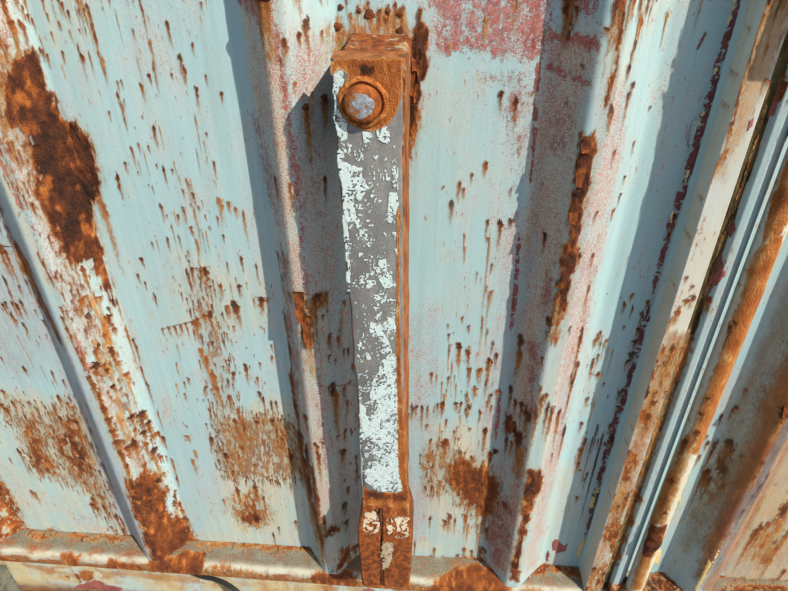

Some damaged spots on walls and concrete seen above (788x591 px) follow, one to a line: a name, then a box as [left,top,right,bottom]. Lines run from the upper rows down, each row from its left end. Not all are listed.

peeling [429,0,600,183]
corrosion [604,0,658,128]
corrosion [724,0,788,152]
corrosion [0,0,614,591]
peeling [332,70,402,493]
peeling [510,232,521,330]
peeling [573,0,740,558]
peeling [546,539,568,561]